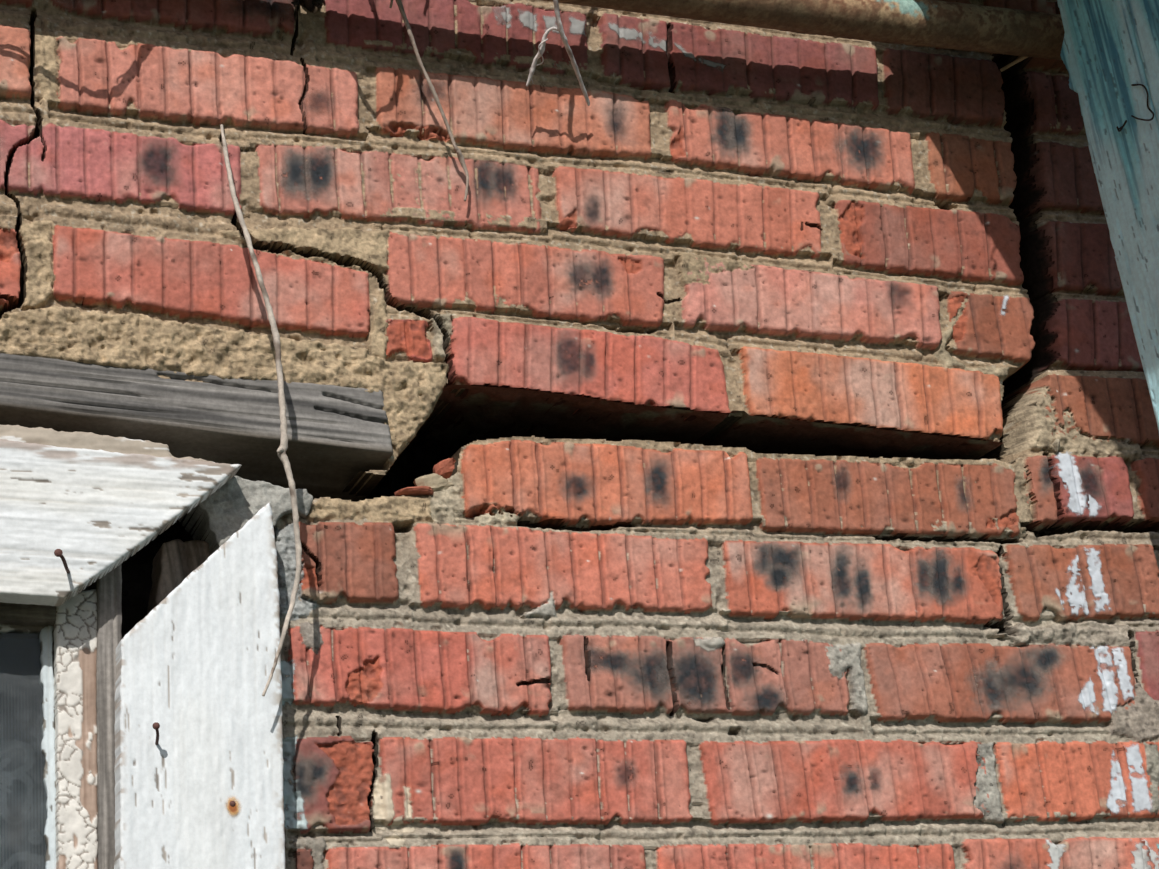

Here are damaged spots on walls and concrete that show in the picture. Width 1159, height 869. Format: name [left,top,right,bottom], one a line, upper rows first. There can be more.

crack [250,4,310,135]
crack [666,25,677,94]
crack [0,12,59,350]
crack [231,54,1159,662]
crack [157,508,207,540]
crack [517,620,586,725]
crack [578,621,624,718]
crack [665,641,694,740]
crack [714,651,777,710]
crack [1107,615,1159,704]
spalling [317,742,374,826]
crack [317,713,383,832]